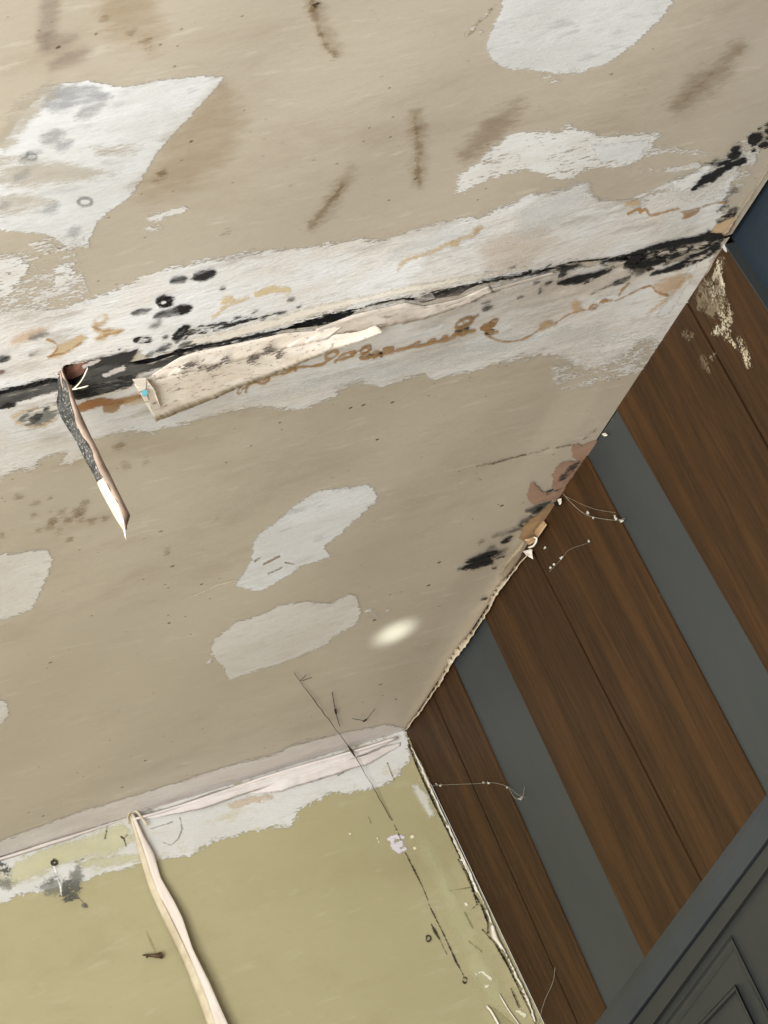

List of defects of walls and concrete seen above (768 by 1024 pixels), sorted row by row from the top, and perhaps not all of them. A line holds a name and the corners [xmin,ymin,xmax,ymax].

mould [691,123,768,191]
peeling [707,217,735,236]
crack [177,257,623,354]
crack [0,360,88,394]
peeling [16,403,59,427]
peeling [518,433,607,559]
crack [394,825,467,984]